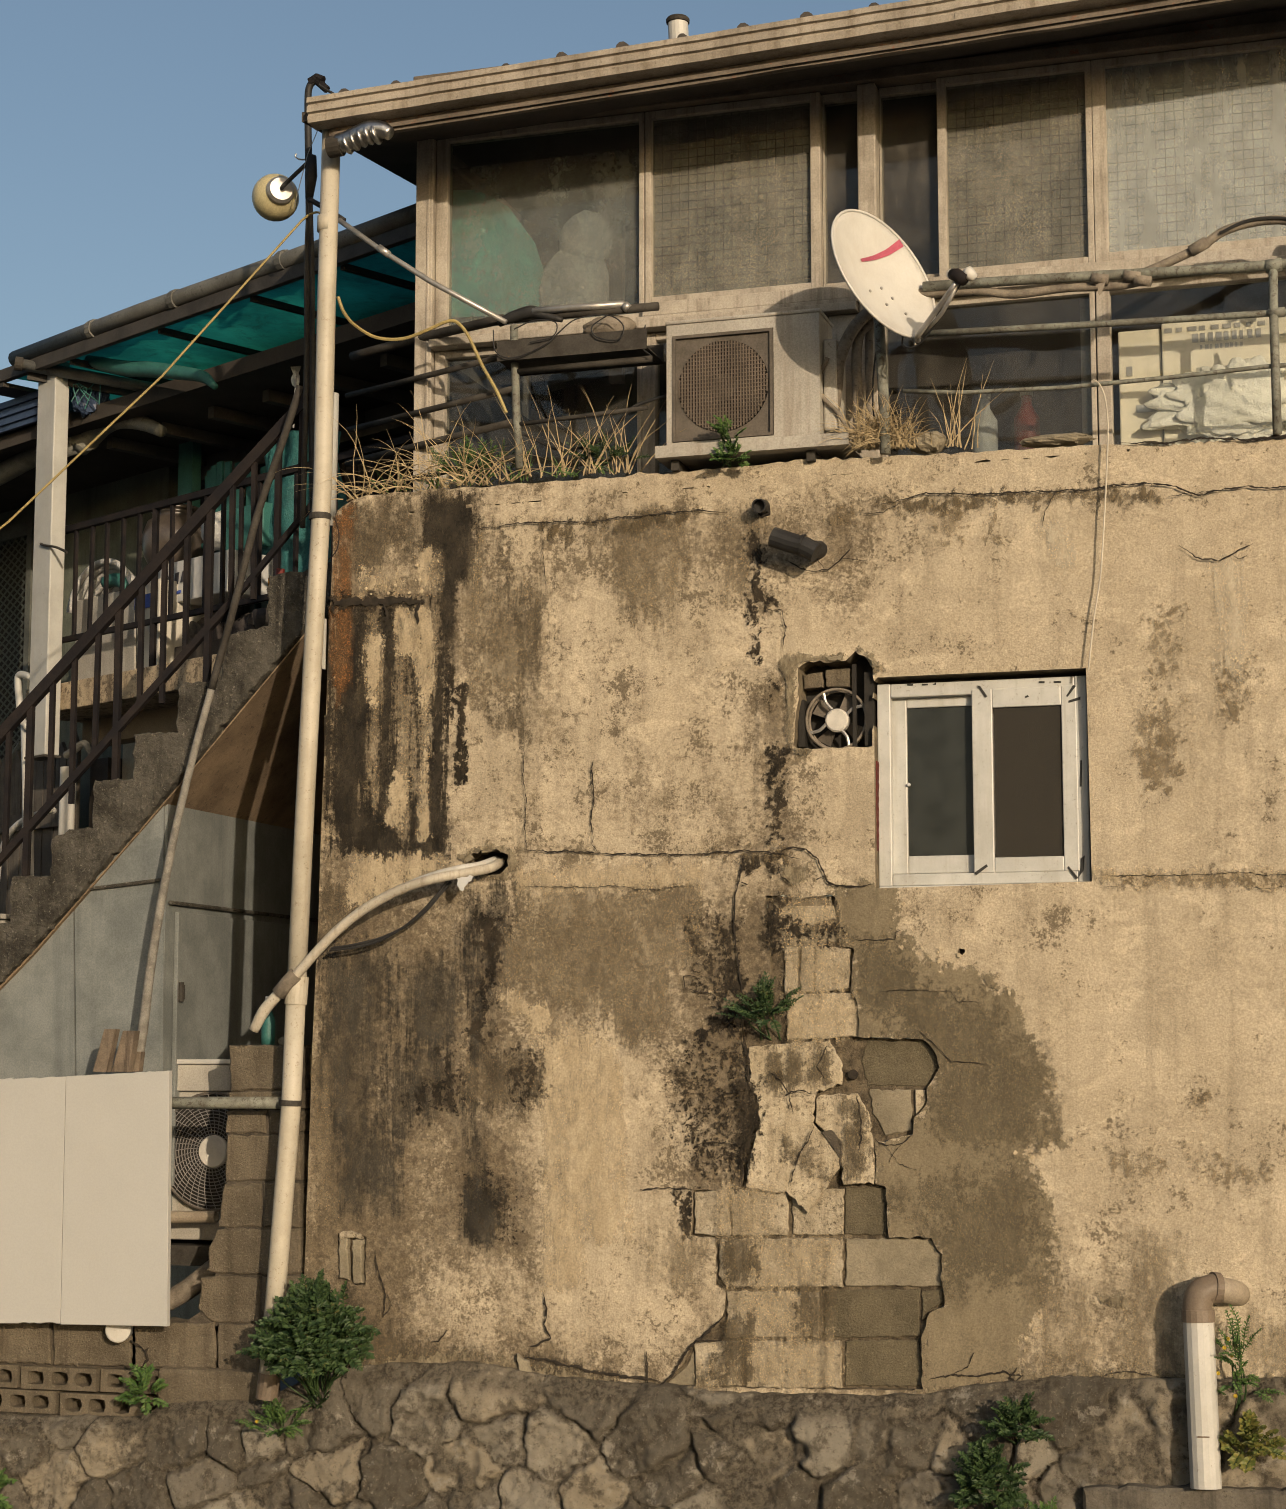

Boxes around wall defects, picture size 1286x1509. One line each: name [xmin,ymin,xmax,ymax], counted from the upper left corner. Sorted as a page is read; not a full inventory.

crack [1121,434,1286,445]
crack [865,482,1286,526]
crack [786,549,866,572]
crack [1179,543,1253,561]
damp [718,505,783,712]
damp [309,488,750,1296]
crack [516,744,871,997]
spalling [665,863,1185,1394]
crack [523,1295,722,1385]
crack [931,1353,1024,1381]
crack [1100,1370,1171,1378]